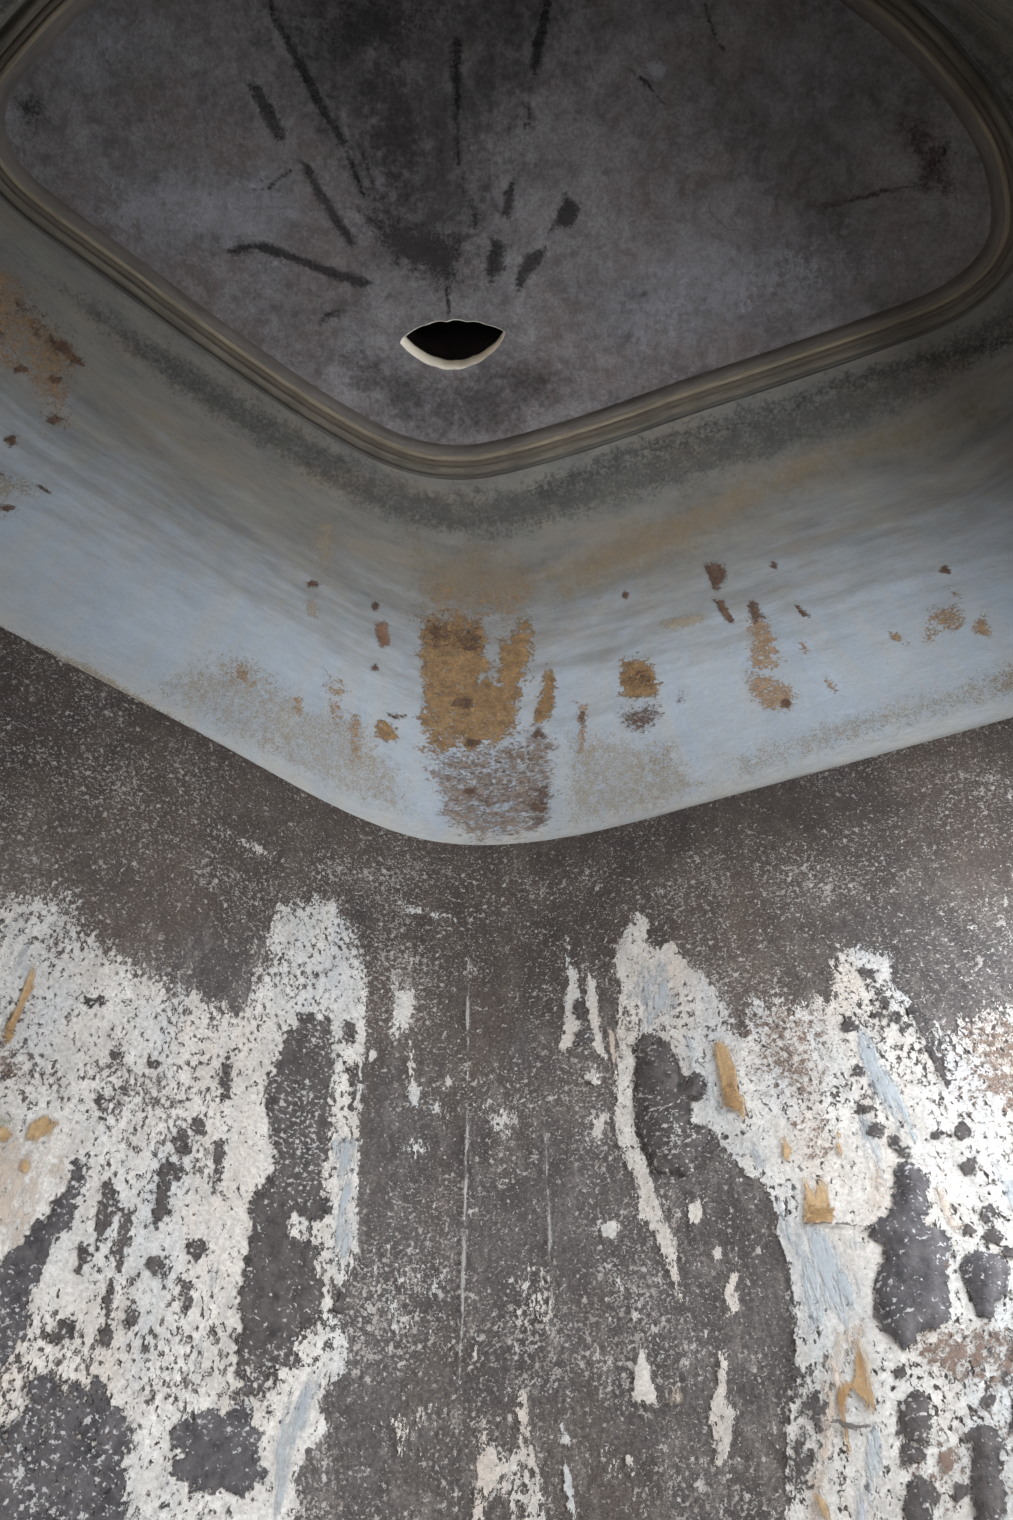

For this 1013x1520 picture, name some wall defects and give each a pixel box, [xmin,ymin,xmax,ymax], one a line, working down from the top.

crack [261,169,292,191]
crack [444,285,452,313]
rust [0,270,85,435]
rust [705,560,799,713]
rust [889,591,992,645]
rust [322,571,562,843]
rust [574,702,590,753]
rust [615,652,685,734]
peeling [473,1102,533,1143]
peeling [0,877,453,1520]
peeling [558,912,1013,1520]
peeling [505,1261,564,1336]